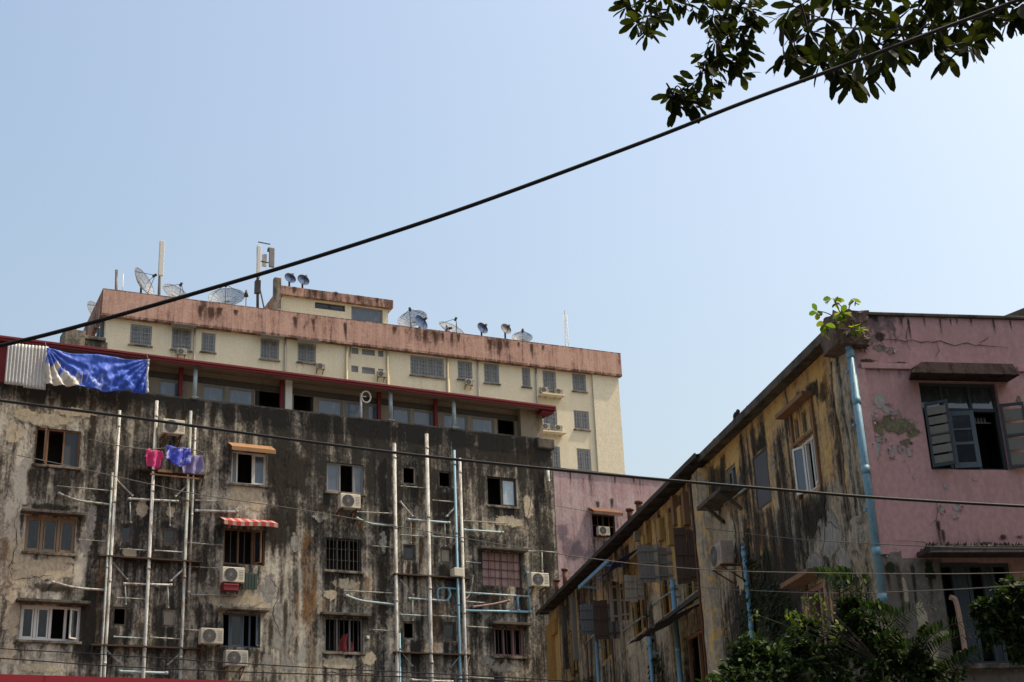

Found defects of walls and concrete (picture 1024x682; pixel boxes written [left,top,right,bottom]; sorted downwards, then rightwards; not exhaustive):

damp [198,306,238,319]
damp [423,330,460,344]
crack [879,322,1008,356]
damp [796,380,827,402]
peeling [871,393,922,460]
damp [20,399,104,569]
damp [269,417,379,554]
damp [739,421,826,588]
damp [29,578,73,593]
damp [193,522,209,583]
damp [370,506,390,643]
damp [268,600,288,646]